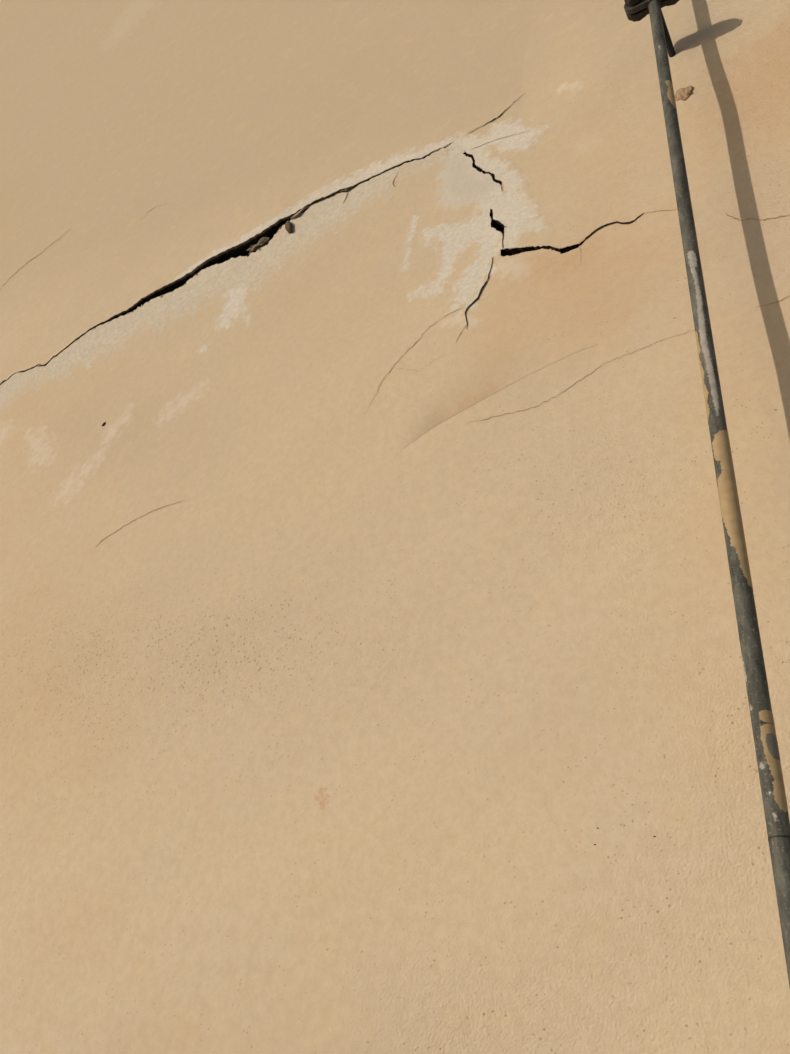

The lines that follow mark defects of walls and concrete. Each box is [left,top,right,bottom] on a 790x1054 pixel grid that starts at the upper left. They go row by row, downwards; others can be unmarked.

crack [0,325,99,385]
peeling [0,116,552,419]
crack [241,96,675,408]